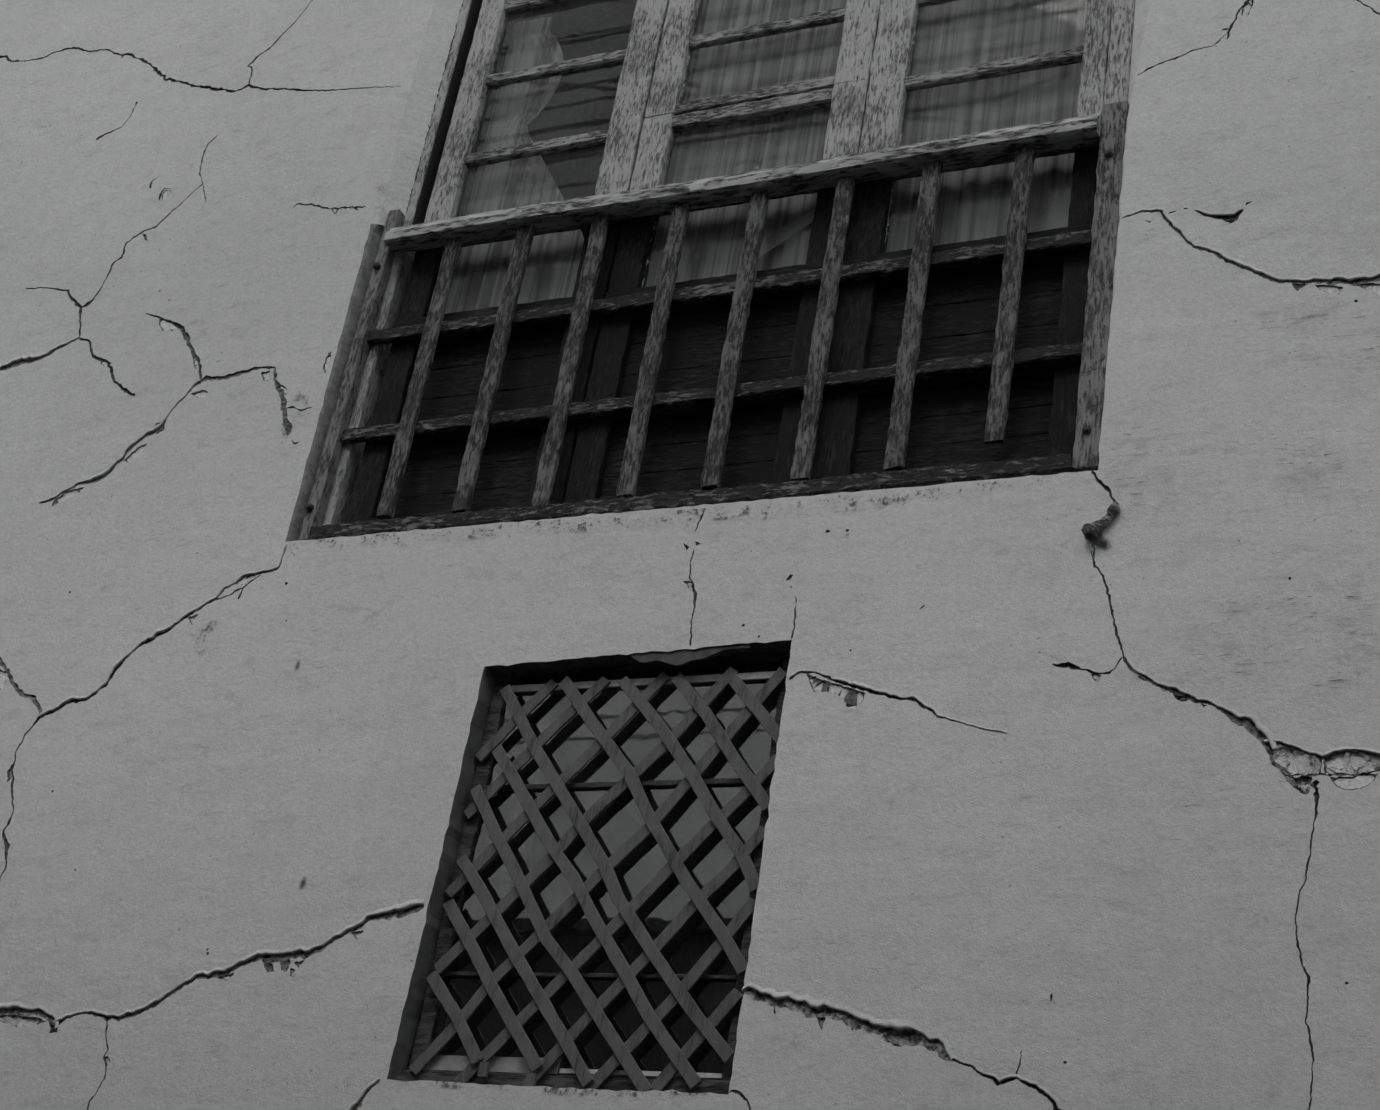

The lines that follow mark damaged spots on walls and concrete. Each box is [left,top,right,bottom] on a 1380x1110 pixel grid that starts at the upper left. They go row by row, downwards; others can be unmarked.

crack [1137,0,1254,76]
crack [0,135,218,396]
crack [294,203,366,214]
crack [1122,201,1380,295]
crack [39,313,312,506]
crack [1091,471,1116,502]
crack [0,544,287,880]
crack [786,575,1007,733]
crack [1052,544,1380,1110]
crack [0,899,424,1110]
crack [742,982,1068,1110]